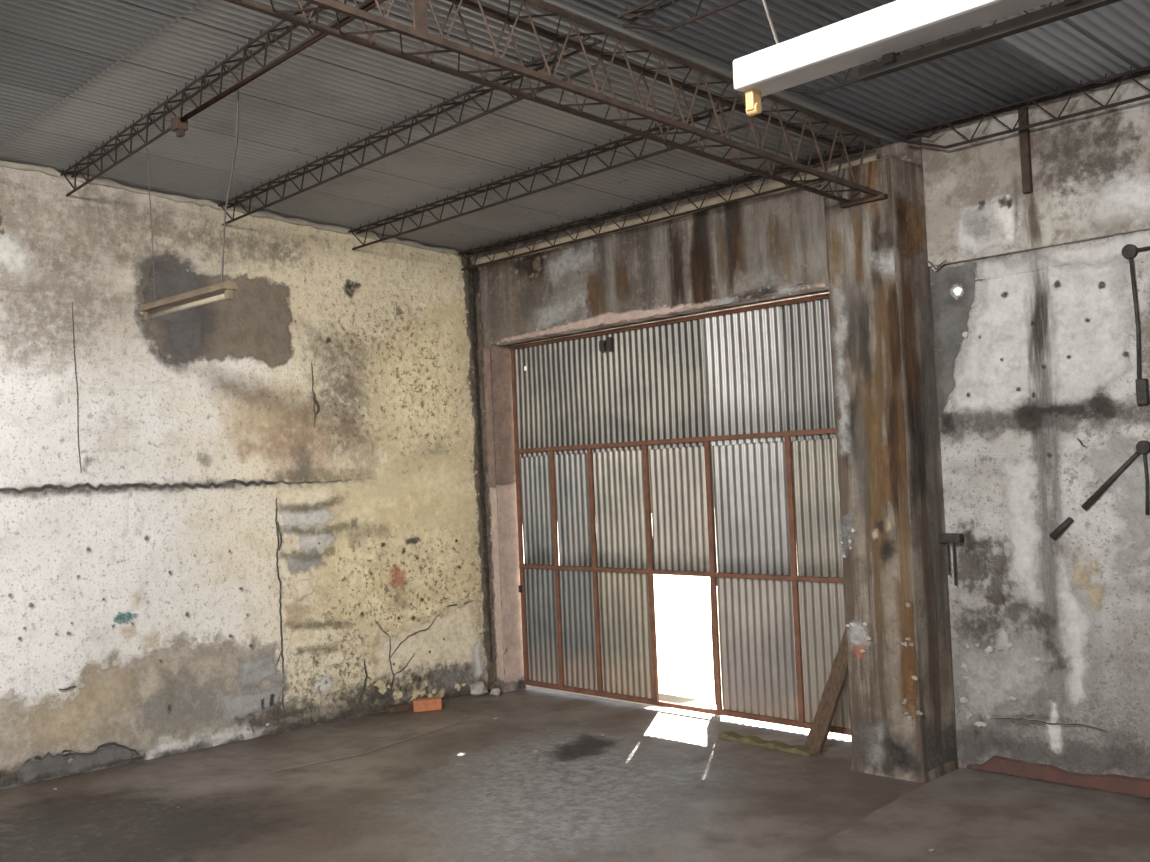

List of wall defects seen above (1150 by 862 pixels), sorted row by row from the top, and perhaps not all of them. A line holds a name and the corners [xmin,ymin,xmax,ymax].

peeling [0,213,35,276]
leakage [15,265,89,355]
spalling [136,256,297,368]
leakage [2,480,235,497]
crack [0,302,373,725]
leakage [250,300,482,652]
rust [862,276,916,709]
leakage [644,157,1150,777]
crack [358,593,473,703]
leakage [0,634,483,788]
leakage [0,795,287,862]